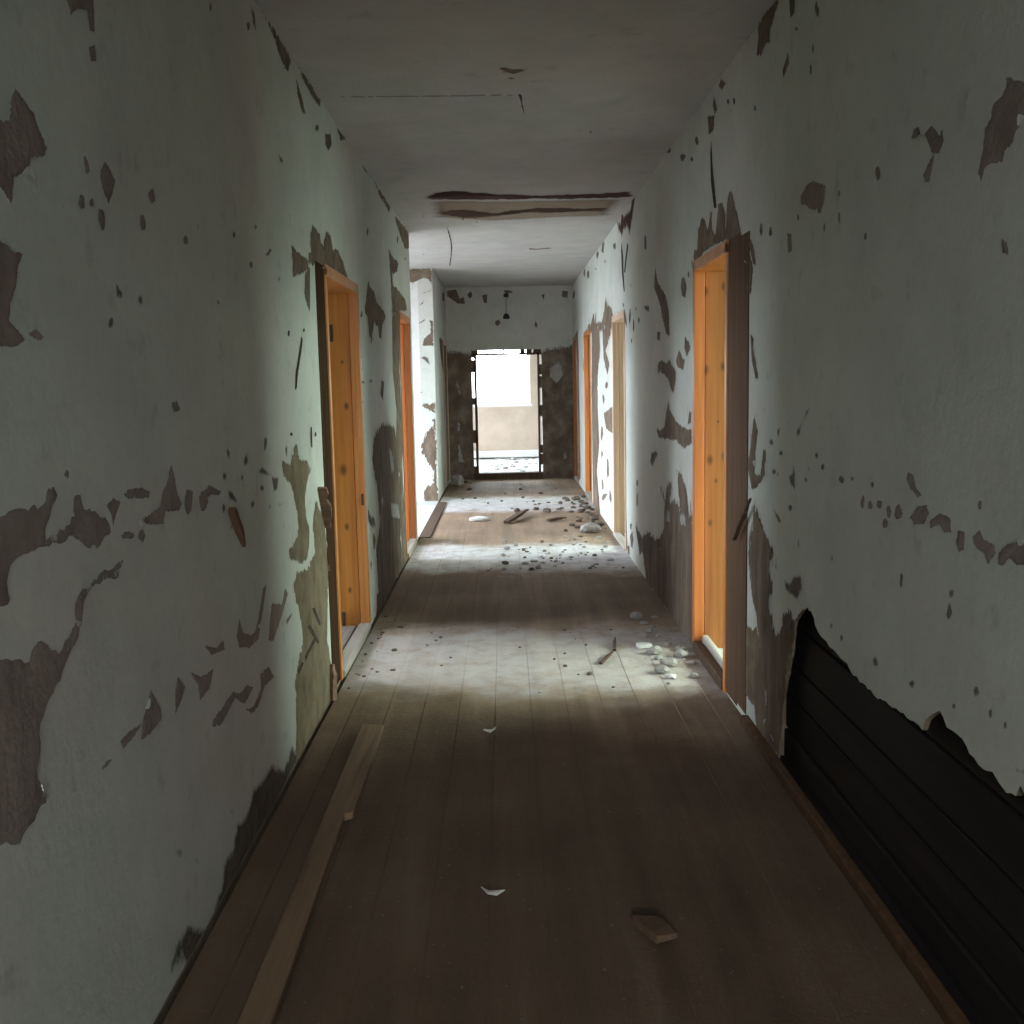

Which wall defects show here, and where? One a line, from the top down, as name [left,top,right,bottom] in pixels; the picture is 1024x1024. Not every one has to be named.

flaking render [0,89,47,202]
flaking render [978,77,1024,180]
flaking render [291,225,349,310]
flaking render [681,192,772,297]
flaking render [360,181,432,615]
flaking render [656,337,692,449]
flaking render [0,464,236,607]
flaking render [237,445,331,762]
flaking render [626,471,692,644]
flaking render [860,471,1024,566]
flaking render [0,560,123,845]
spalling [746,505,1024,1024]